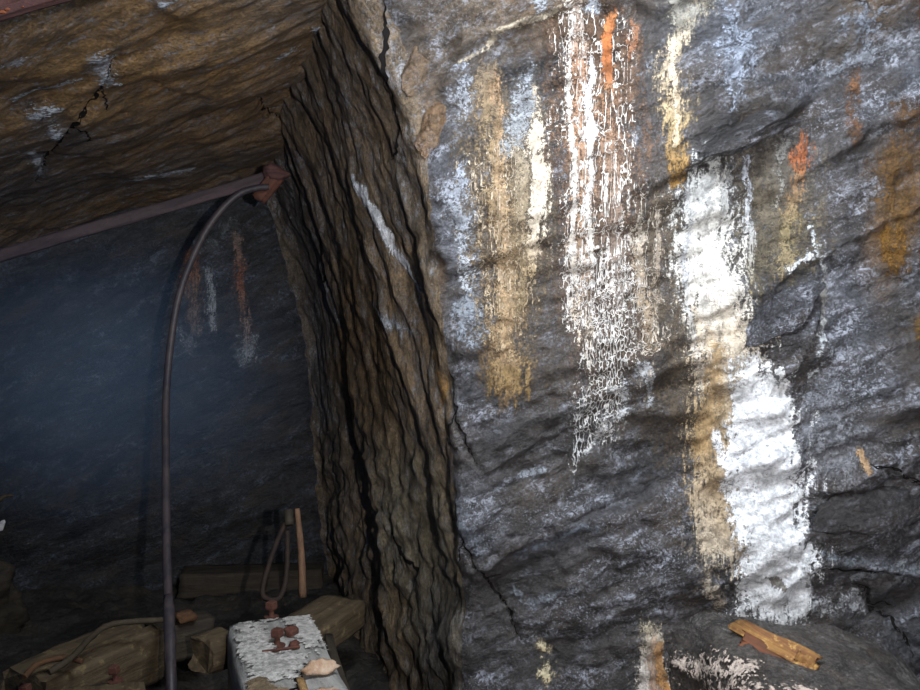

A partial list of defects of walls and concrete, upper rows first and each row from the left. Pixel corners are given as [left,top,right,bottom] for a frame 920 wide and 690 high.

crack [36,55,115,184]
crack [378,1,400,160]
rust [600,6,639,90]
rust [724,107,836,300]
rust [844,73,863,145]
rust [866,92,920,279]
damp [323,222,413,460]
damp [433,0,920,626]
crack [870,464,920,485]
crack [809,566,920,657]